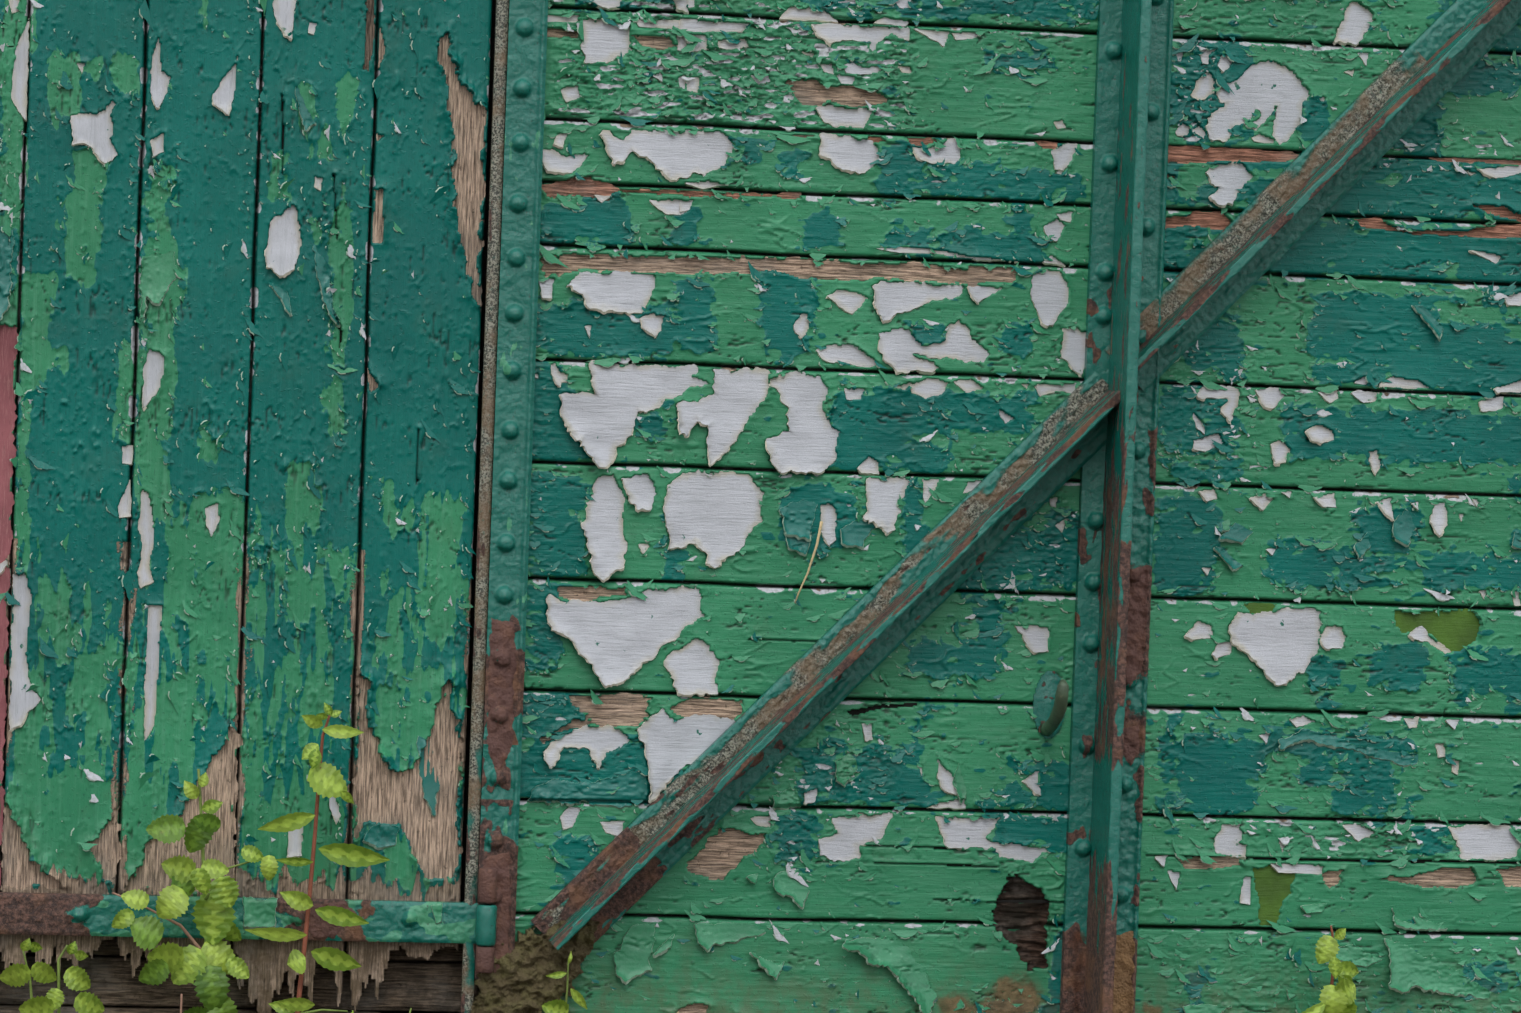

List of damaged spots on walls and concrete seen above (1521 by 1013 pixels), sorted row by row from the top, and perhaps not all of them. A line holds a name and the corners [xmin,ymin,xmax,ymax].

peeling [1163,0,1417,282]
peeling [0,0,489,929]
corrosion [487,618,517,769]
peeling [519,0,1099,926]
peeling [584,497,1077,1013]
corrosion [1126,565,1150,687]
peeling [1138,45,1521,1013]
corrosion [482,852,513,973]
corrosion [1112,931,1136,1013]